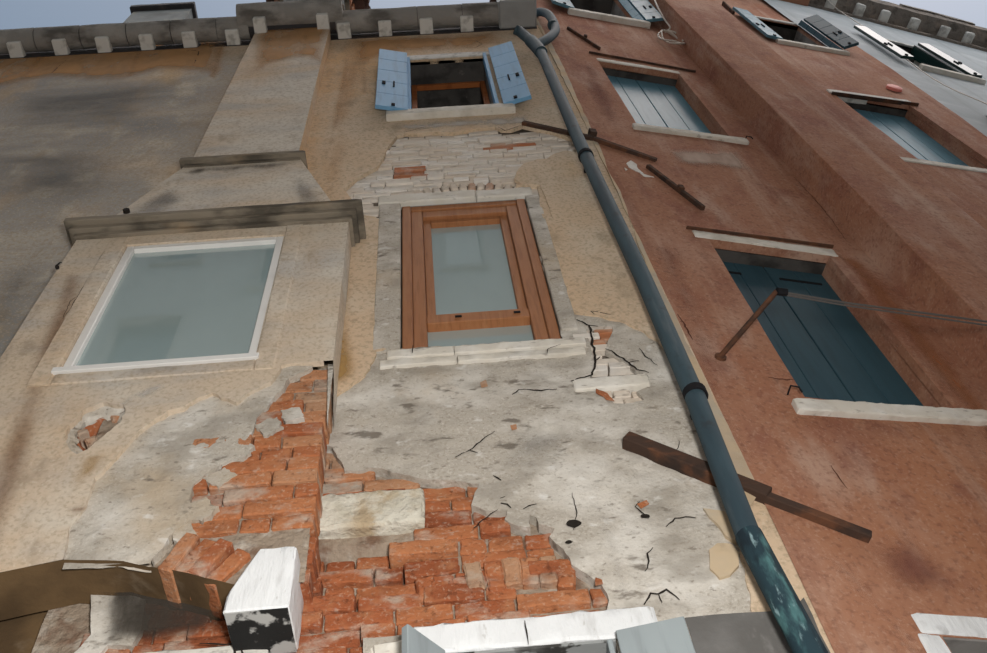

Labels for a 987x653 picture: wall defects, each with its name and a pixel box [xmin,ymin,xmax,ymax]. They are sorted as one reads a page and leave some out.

flaking render [346,129,576,219]
flaking render [400,210,442,350]
crack [512,311,657,395]
flaking render [32,314,751,653]